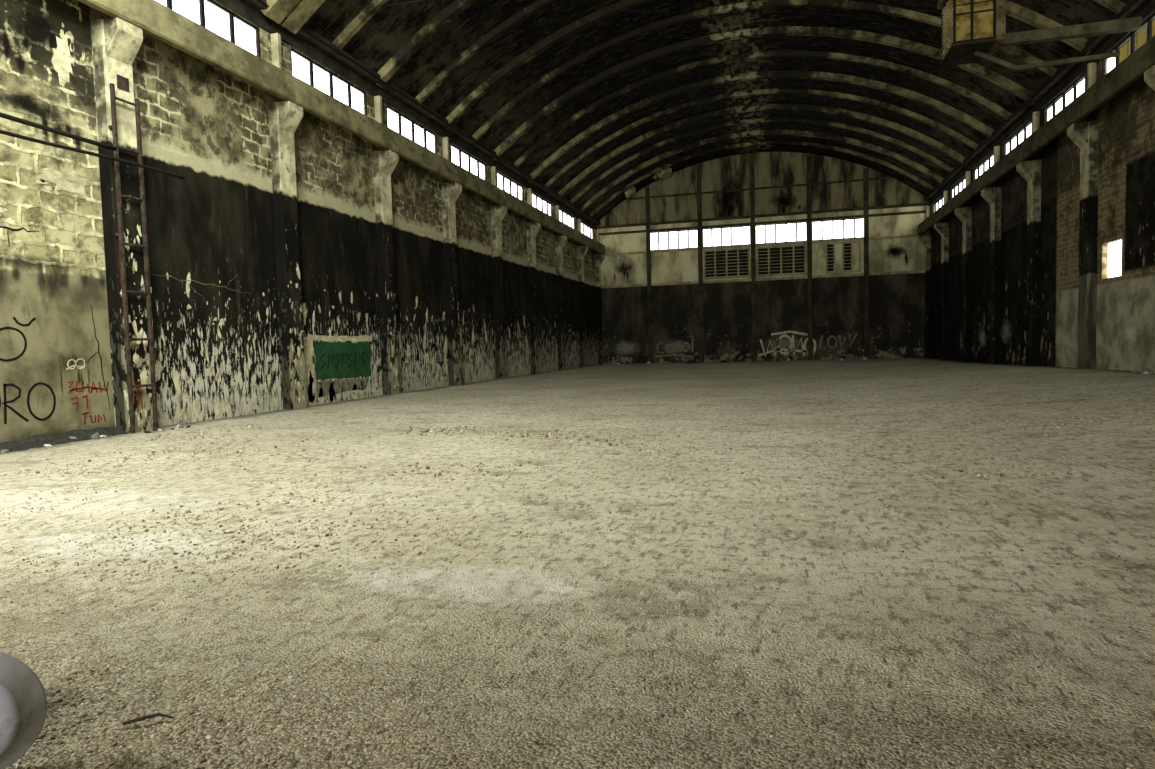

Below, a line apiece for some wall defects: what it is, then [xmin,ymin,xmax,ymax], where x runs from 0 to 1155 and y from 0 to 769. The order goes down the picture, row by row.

spalling [51,23,74,87]
spalling [35,168,96,197]